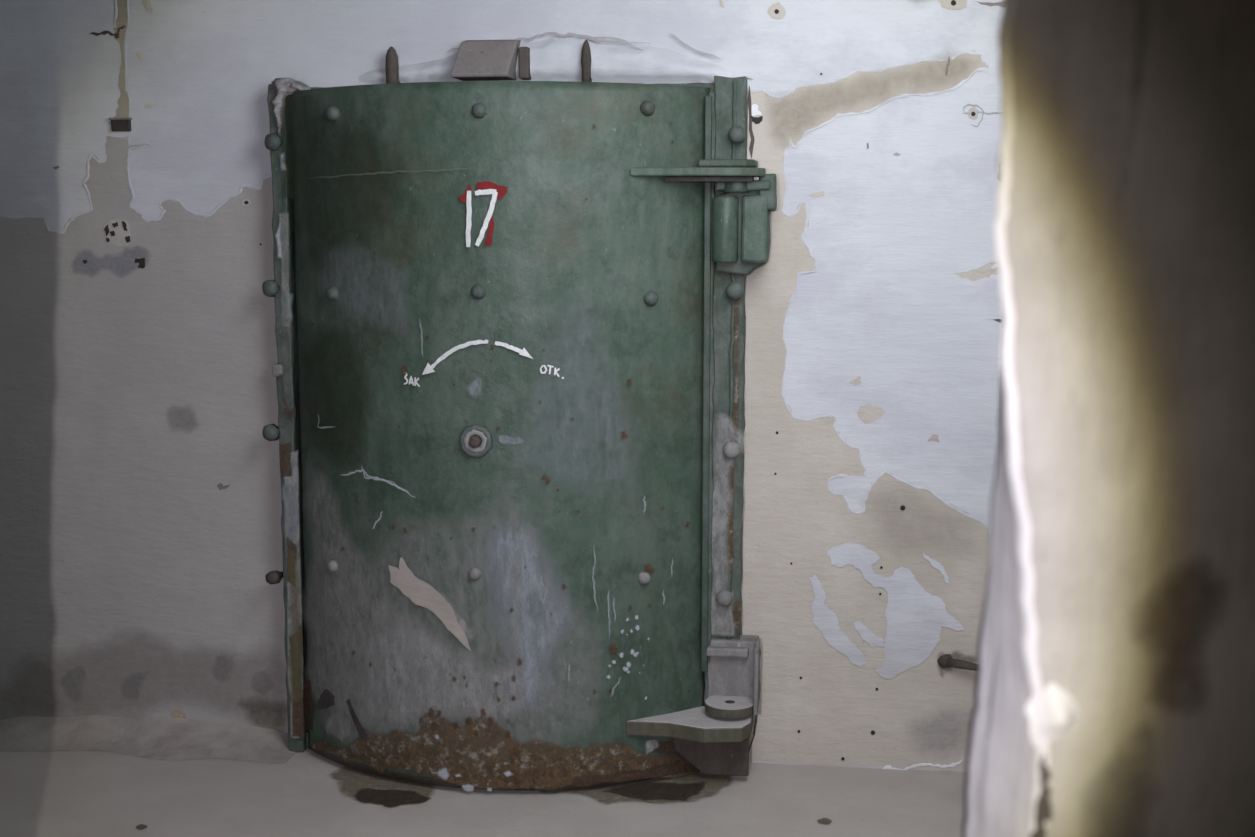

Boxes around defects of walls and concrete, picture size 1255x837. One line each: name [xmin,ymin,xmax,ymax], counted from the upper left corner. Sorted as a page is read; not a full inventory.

peeling [0,0,288,733]
peeling [741,51,989,771]
peeling [953,258,999,281]